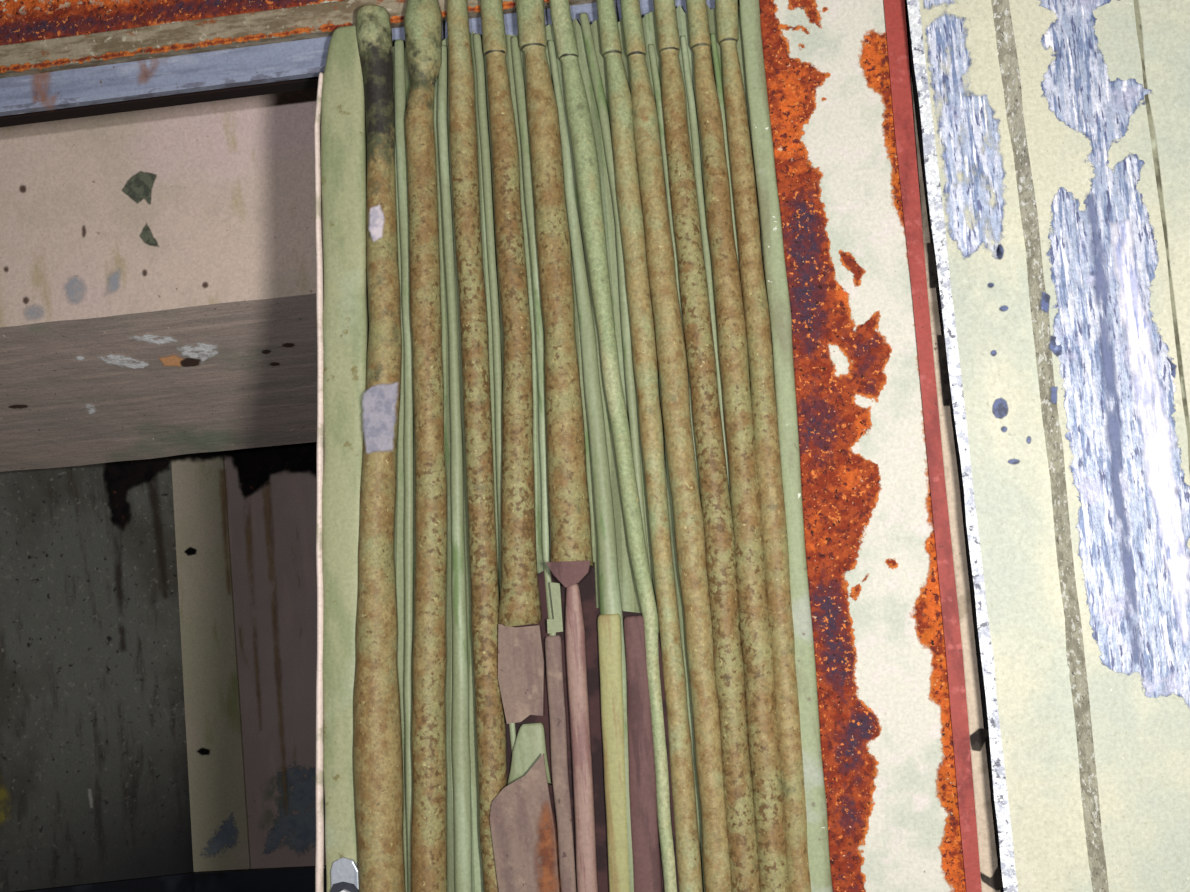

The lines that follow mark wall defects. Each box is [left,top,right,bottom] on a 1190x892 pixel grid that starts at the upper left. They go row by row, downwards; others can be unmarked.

rust [0,0,344,46]
rust [0,22,356,73]
rust [860,30,905,235]
peeling [924,0,1005,259]
rust [104,442,317,597]
rust [759,0,892,892]
peeling [993,398,1008,432]
peeling [1040,0,1190,707]
rust [912,468,966,892]
rust [539,807,557,892]